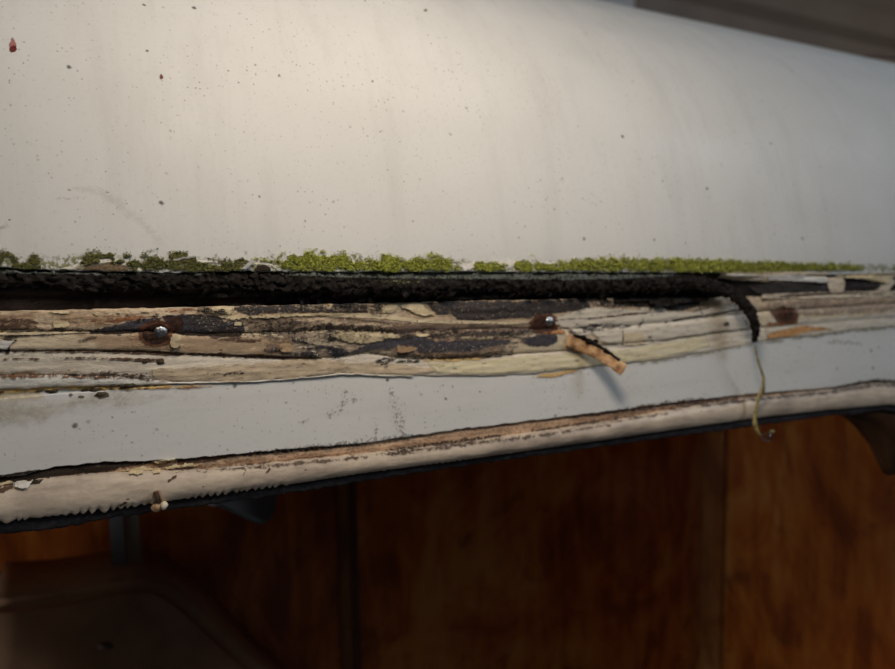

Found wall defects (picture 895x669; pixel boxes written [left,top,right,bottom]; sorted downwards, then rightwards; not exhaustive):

water stain [278,271,676,283]
peeling [0,311,89,335]
rust [52,308,192,351]
peeling [170,334,181,348]
peeling [196,303,528,344]
spalling [555,303,751,376]
peeling [123,459,198,475]
peeling [0,480,32,489]